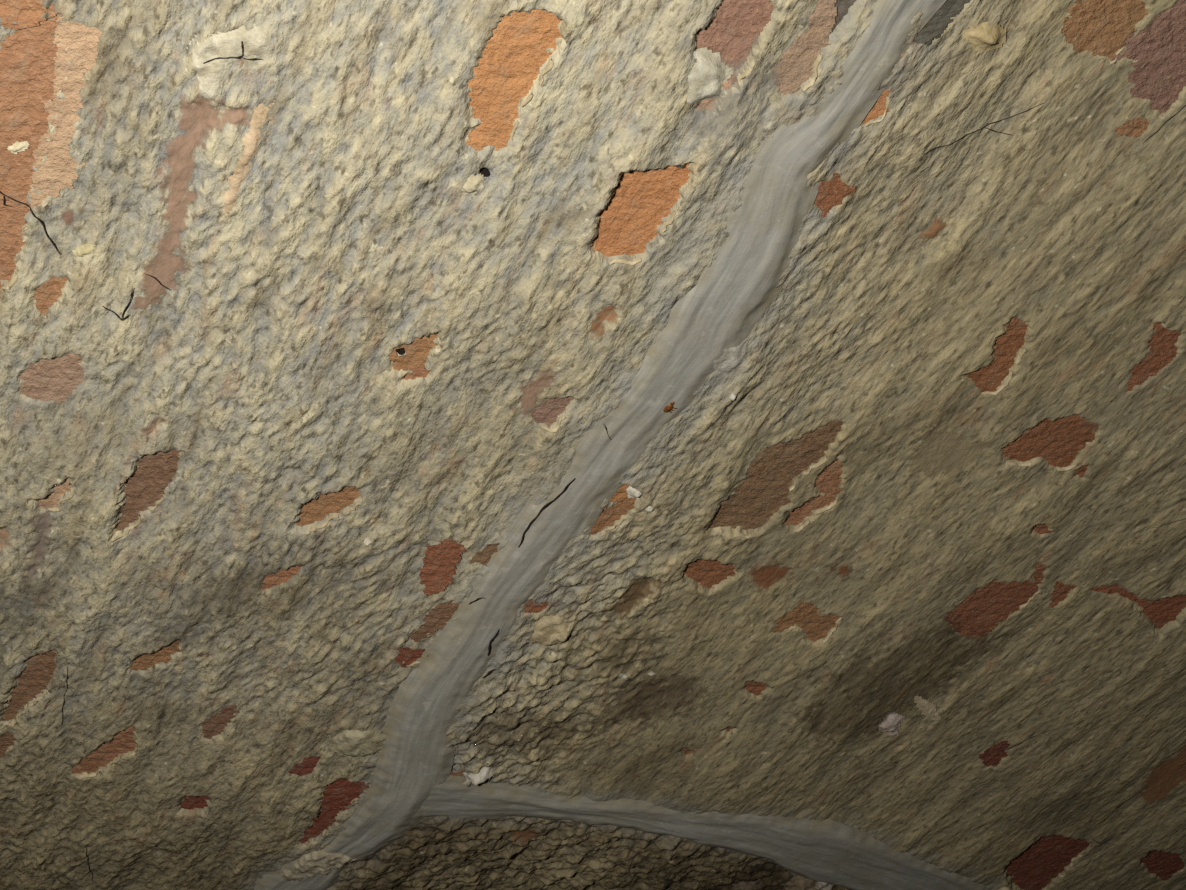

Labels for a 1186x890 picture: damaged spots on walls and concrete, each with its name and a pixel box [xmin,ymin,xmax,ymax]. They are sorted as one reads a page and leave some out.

spalling [466,9,563,151]
spalling [687,0,774,112]
spalling [1061,0,1186,138]
spalling [0,0,103,290]
spalling [592,162,691,266]
spalling [111,449,180,542]
crack [518,478,575,547]
spalling [709,420,843,539]
spalling [1002,414,1099,478]
spalling [945,563,1076,638]
spalling [1090,584,1186,630]
spalling [999,835,1090,890]